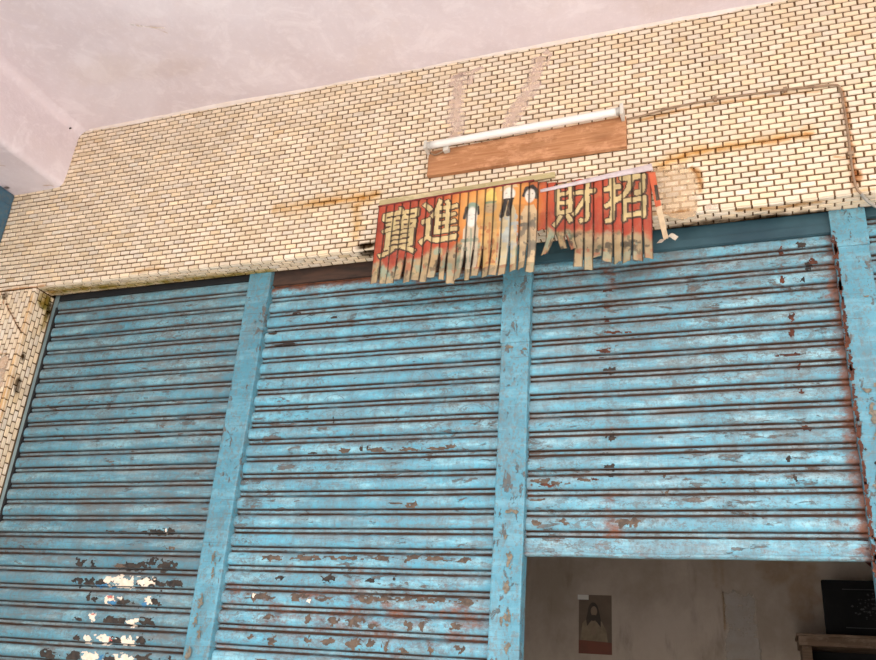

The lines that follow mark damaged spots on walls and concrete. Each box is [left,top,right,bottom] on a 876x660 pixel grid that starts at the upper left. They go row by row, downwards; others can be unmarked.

rust [778,242,818,282]
rust [596,348,617,375]
rust [831,231,876,585]
peeling [862,383,876,440]
rust [600,430,623,477]
peeling [40,527,183,660]